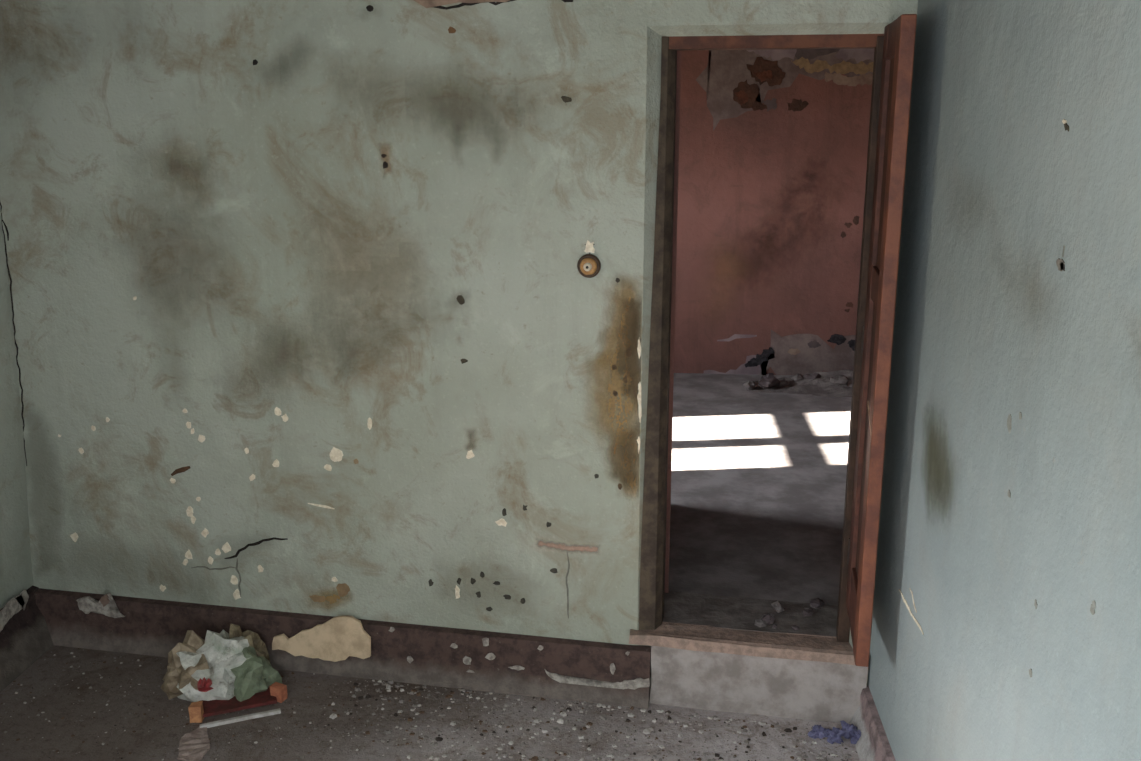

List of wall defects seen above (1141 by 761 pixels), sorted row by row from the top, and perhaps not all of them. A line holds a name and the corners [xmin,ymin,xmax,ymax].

flaking render [414,0,515,10]
flaking render [696,48,874,131]
crack [0,202,27,466]
flaking render [703,330,856,375]
crack [191,537,288,597]